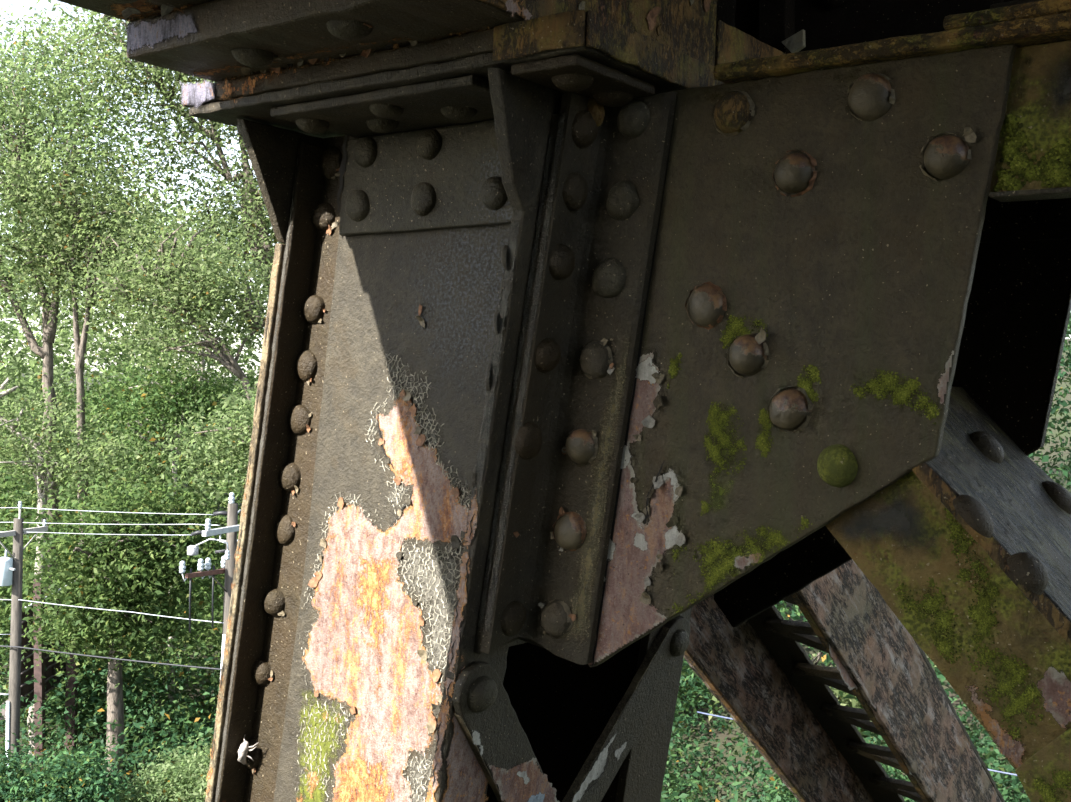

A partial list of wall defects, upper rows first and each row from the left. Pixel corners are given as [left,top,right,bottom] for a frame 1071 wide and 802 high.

rust [108,2,193,21]
rust [499,0,533,20]
rust [212,53,347,103]
peeling [588,352,685,665]
water stain [837,492,927,547]
rust [302,389,489,802]
rust [828,642,858,690]
rust [296,772,318,802]
peeling [472,730,627,802]